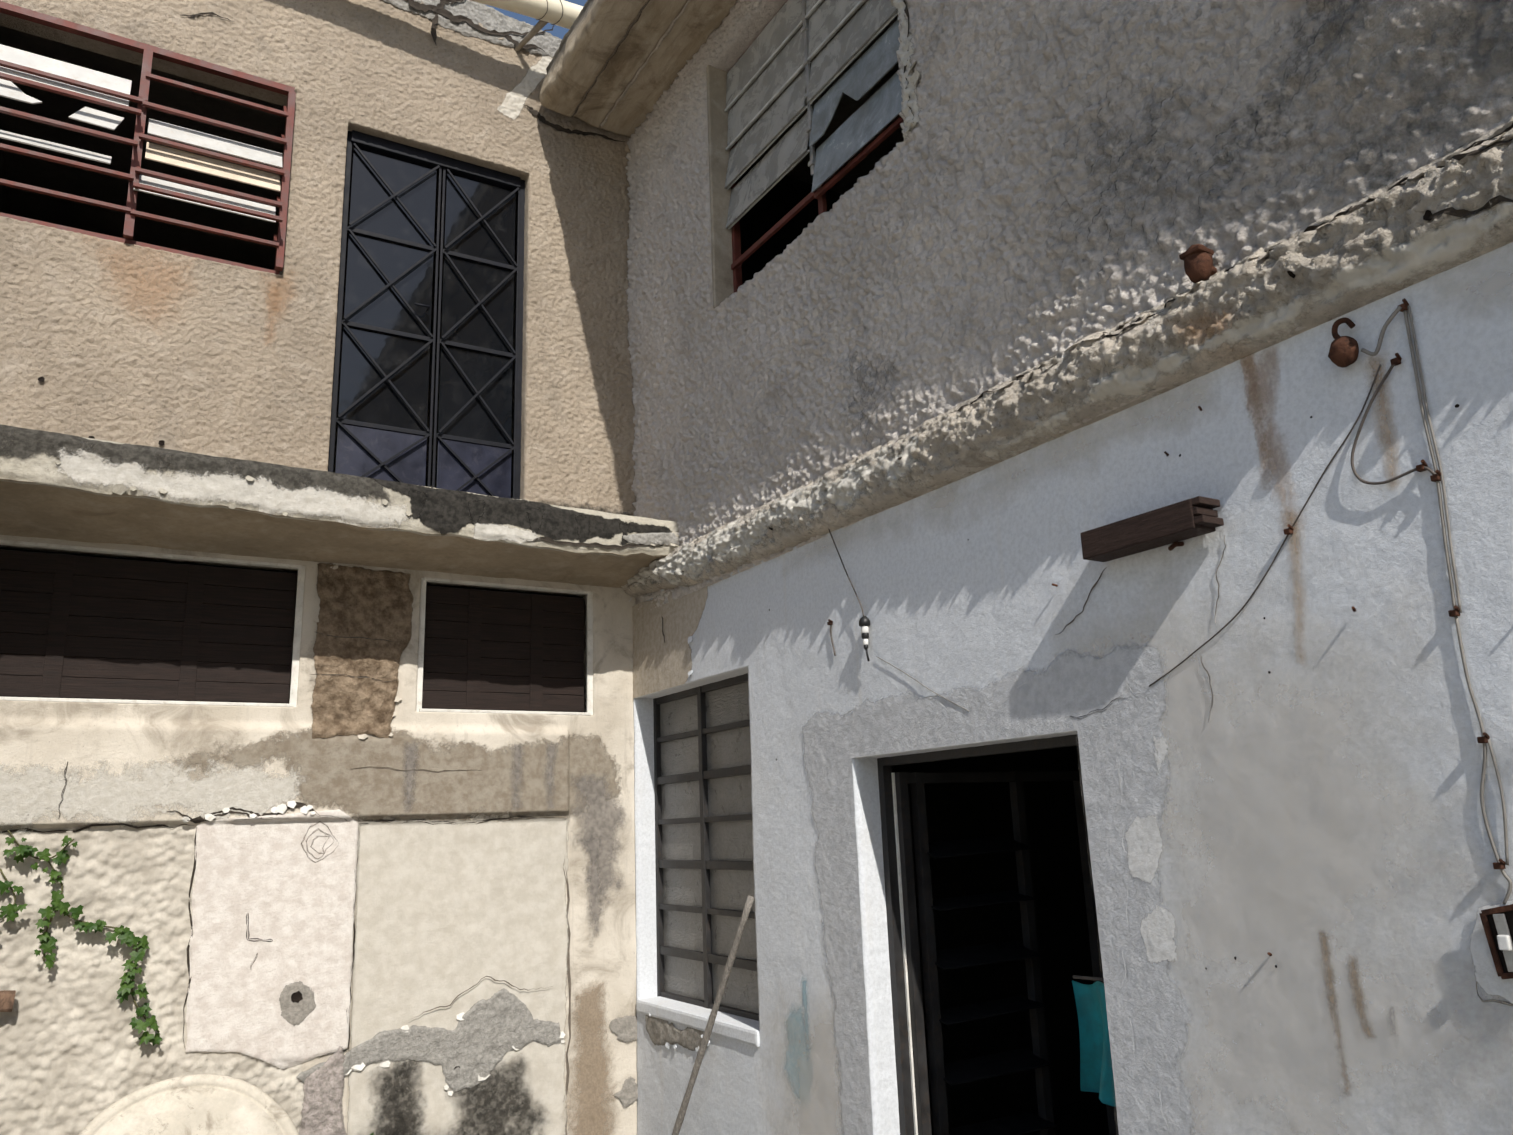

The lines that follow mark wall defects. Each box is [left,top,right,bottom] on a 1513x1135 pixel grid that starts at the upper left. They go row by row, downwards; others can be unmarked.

flaking render [383,0,562,120]
crack [951,97,1513,413]
peeling [55,449,412,528]
peeling [474,523,538,544]
flaking render [0,563,620,1135]
peeling [1125,816,1163,883]
peeling [1140,905,1177,964]